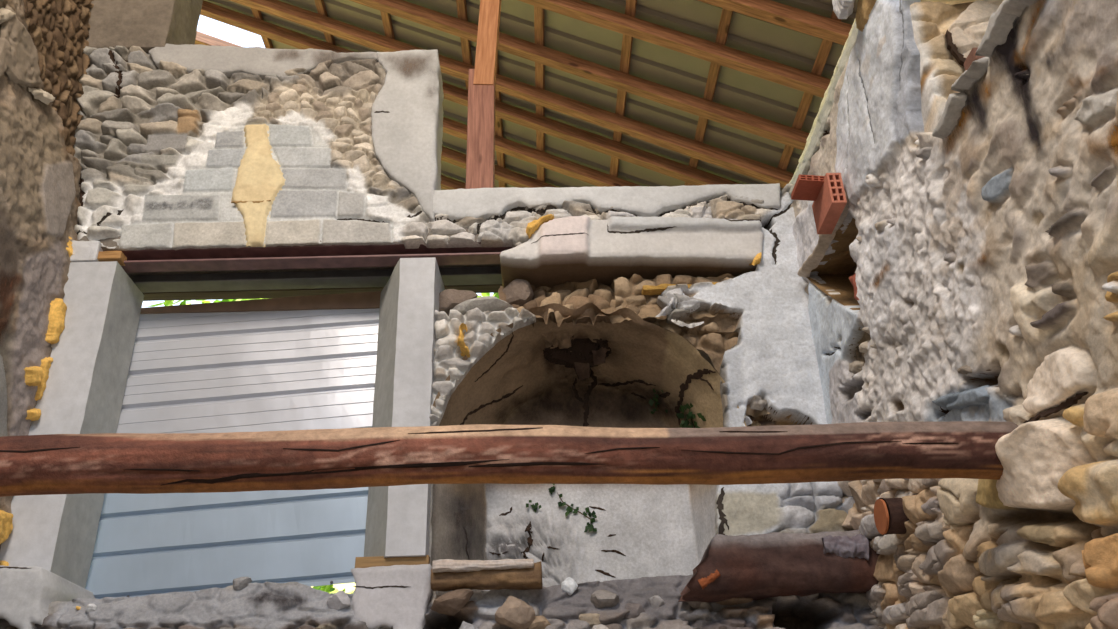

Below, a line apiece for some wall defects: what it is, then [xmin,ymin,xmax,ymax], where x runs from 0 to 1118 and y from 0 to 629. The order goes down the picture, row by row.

water stain [966,85,985,127]
water stain [992,18,1041,152]
crack [337,197,792,264]
spalling [656,288,741,336]
crack [460,328,523,425]
spalling [542,330,612,380]
water stain [514,343,687,420]
crack [573,368,717,427]